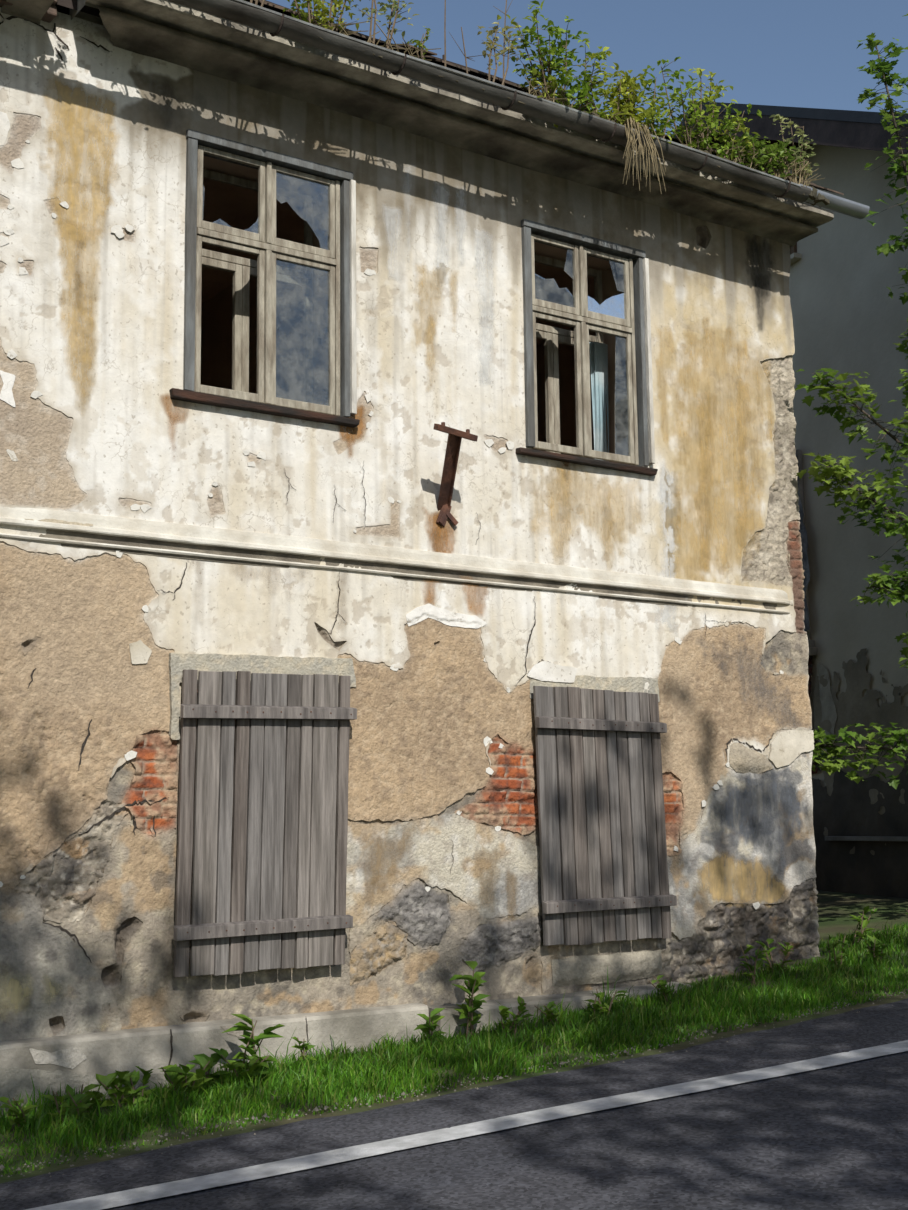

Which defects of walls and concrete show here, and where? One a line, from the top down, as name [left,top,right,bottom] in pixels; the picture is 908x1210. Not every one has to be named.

damp [50,82,114,396]
damp [747,237,772,309]
peeling [0,339,93,526]
corrosion [428,514,453,553]
spalling [657,355,837,857]
spalling [0,541,646,1037]
crack [42,922,92,964]